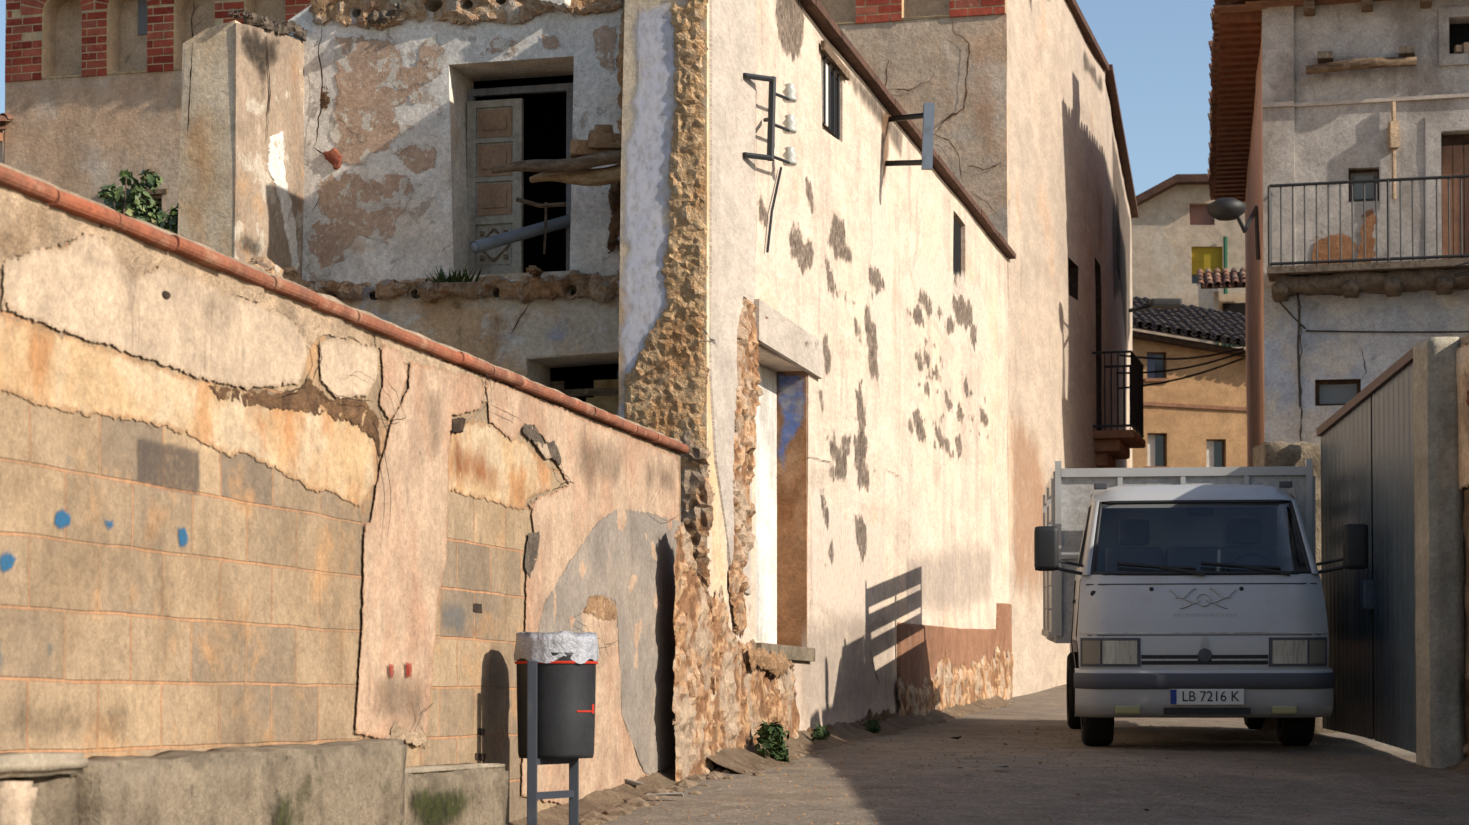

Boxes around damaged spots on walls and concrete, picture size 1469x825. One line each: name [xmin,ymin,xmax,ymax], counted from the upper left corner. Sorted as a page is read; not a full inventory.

peeling [267,3,446,282]
peeling [542,34,563,49]
peeling [593,25,617,75]
spalling [607,181,621,255]
crack [885,20,1001,216]
peeling [0,233,409,507]
peeling [448,417,562,510]
spalling [525,532,540,577]
spalling [583,595,617,620]
flaking render [728,297,794,680]
peeling [760,85,891,627]
peeling [909,249,989,459]